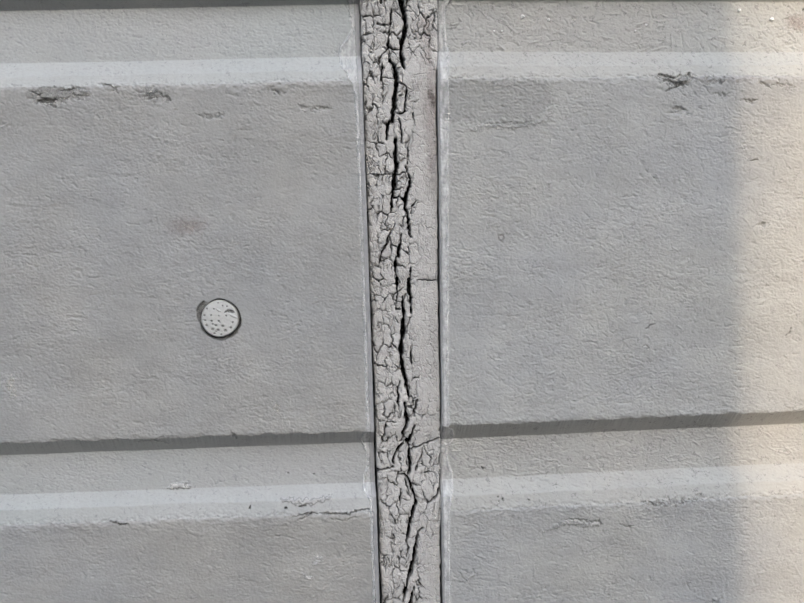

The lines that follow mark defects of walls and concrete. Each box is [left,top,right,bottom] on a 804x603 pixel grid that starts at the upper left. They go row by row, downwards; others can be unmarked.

crack [361,0,441,603]